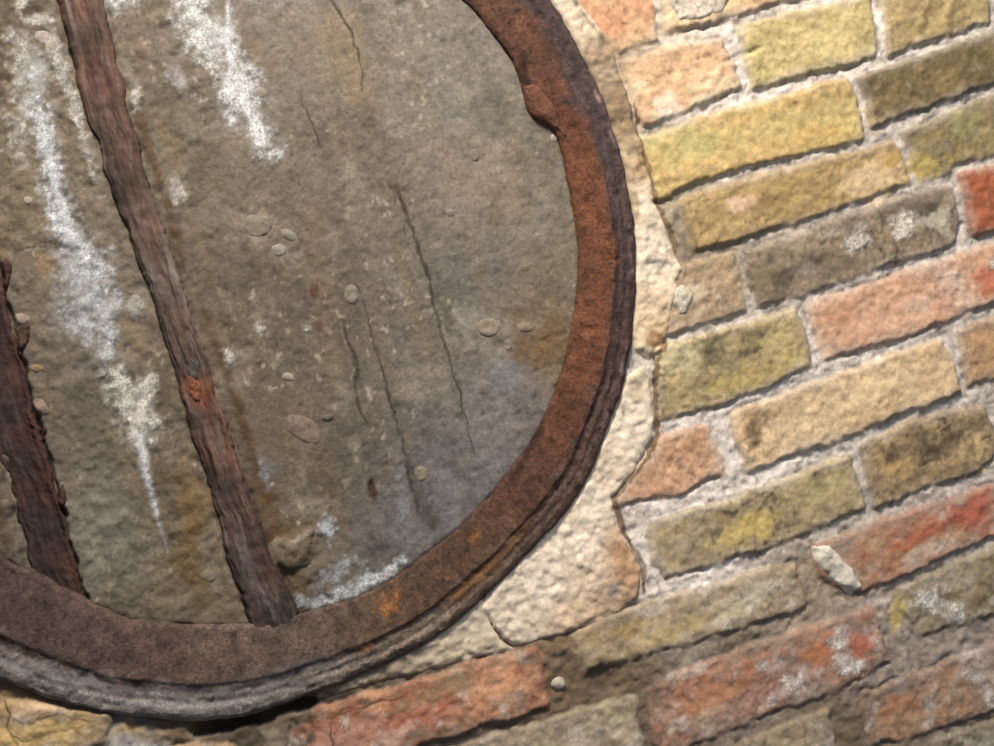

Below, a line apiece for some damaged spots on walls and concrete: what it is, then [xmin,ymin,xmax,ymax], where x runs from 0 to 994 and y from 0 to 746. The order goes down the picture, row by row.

water stain [169,0,283,160]
water stain [171,179,186,202]
rust [0,259,13,293]
water stain [2,28,161,524]
crack [399,196,433,302]
rust [16,323,30,358]
water stain [317,512,339,536]
water stain [294,555,407,610]
rust [372,591,399,616]
rust [445,525,526,599]